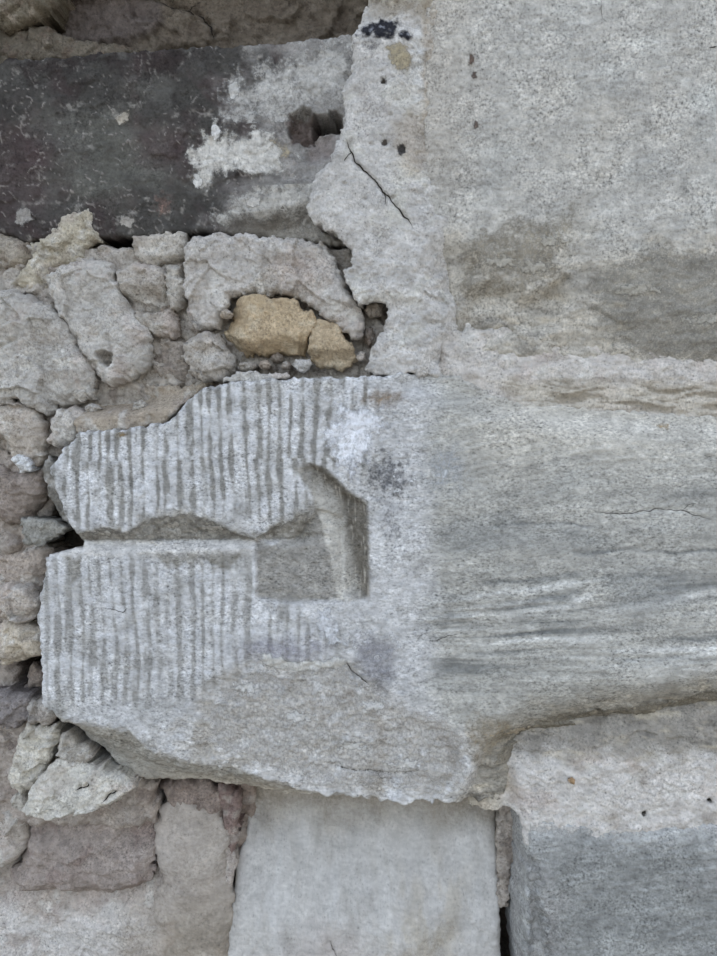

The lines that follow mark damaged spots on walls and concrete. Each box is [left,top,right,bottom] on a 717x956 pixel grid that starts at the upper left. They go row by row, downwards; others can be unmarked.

crack [344,139,412,225]